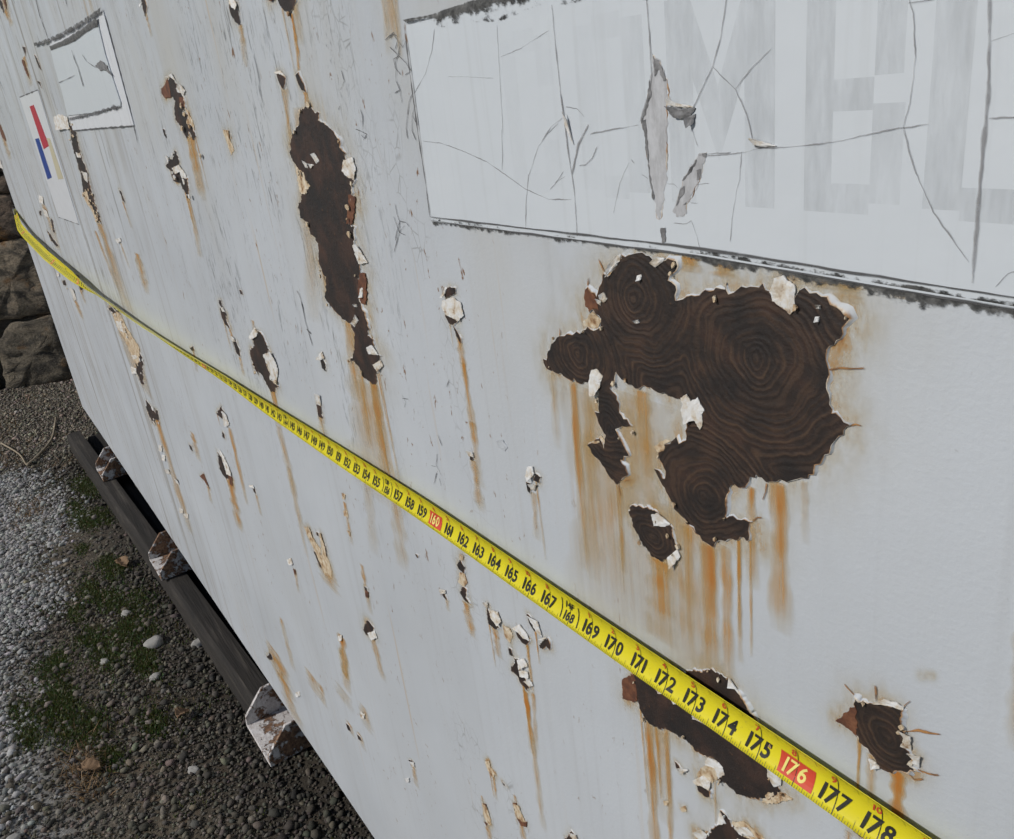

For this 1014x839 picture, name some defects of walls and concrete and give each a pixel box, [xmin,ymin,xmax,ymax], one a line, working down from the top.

rust [440,286,469,403]
rust [543,252,863,648]
rust [457,554,553,744]